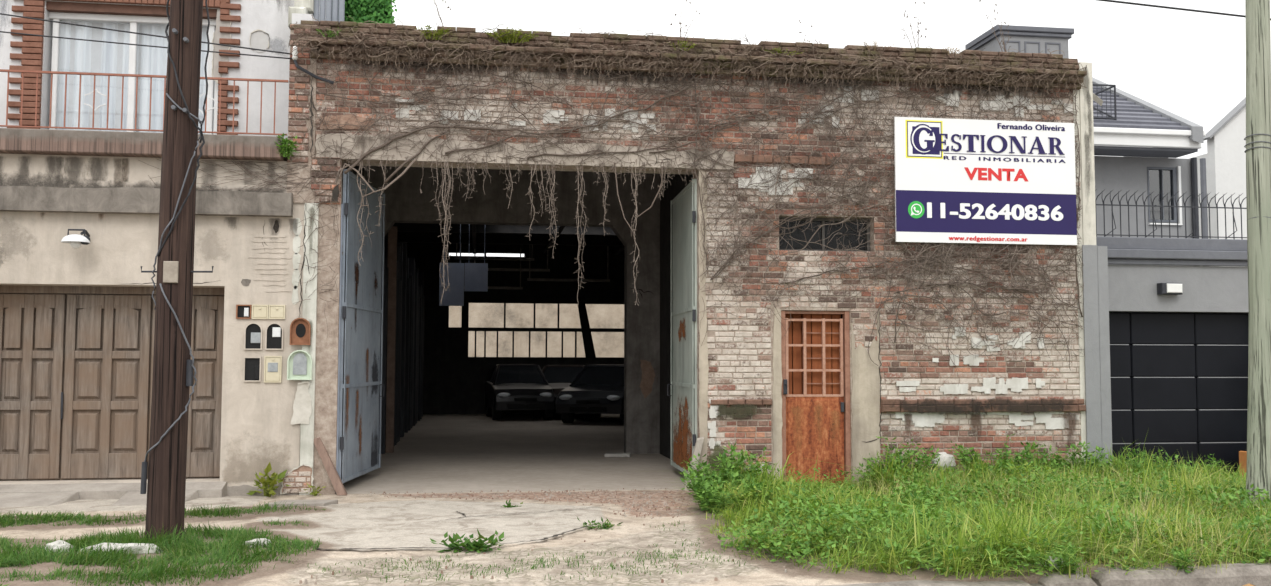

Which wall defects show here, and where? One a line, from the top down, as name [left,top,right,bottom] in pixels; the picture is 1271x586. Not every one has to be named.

peeling [738,166,813,195]
peeling [932,327,1045,394]
peeling [896,380,920,392]
rust [346,349,378,466]
peeling [708,399,721,449]
peeling [895,412,945,427]
peeling [970,412,1079,429]